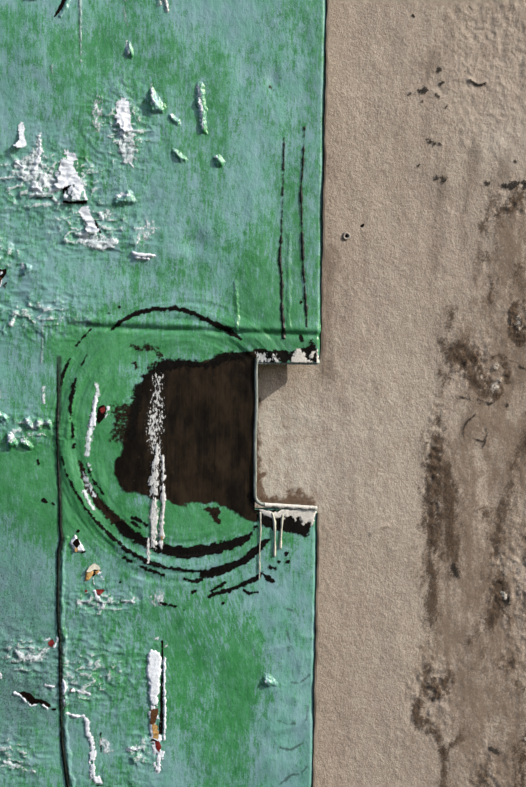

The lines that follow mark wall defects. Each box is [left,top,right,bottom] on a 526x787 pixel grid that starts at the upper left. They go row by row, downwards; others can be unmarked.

peeling [13,122,118,251]
peeling [114,97,136,168]
peeling [131,219,157,260]
peeling [82,340,319,537]
rust [257,422,315,505]
leakage [411,180,526,787]
leakage [56,358,290,787]
peeling [44,679,113,786]
peeling [146,637,168,774]